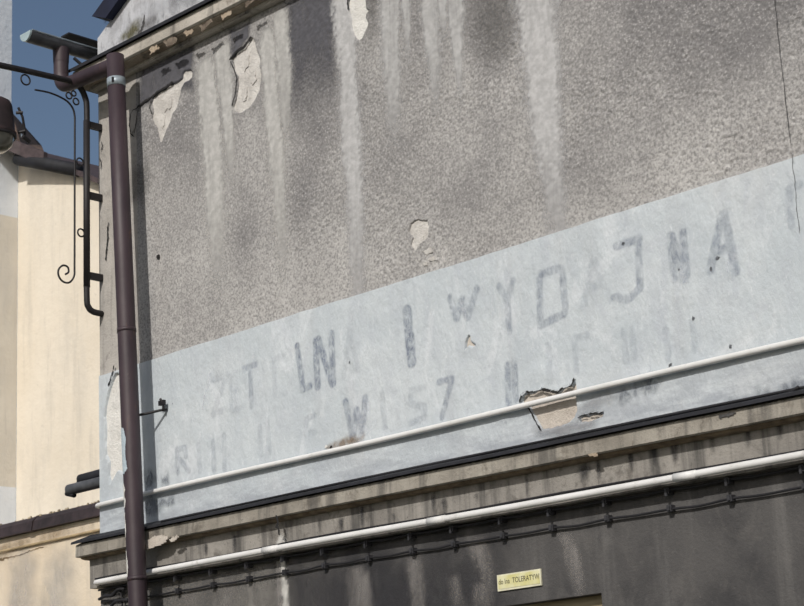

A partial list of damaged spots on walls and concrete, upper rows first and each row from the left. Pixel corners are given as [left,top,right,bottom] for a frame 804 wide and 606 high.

flaking render [137,71,192,142]
leakage [195,42,235,262]
flaking render [229,36,261,113]
leakage [259,9,291,246]
leakage [331,0,364,280]
flaking render [347,0,368,40]
leakage [421,0,465,89]
leakage [514,0,565,221]
crack [774,0,800,232]
peeling [519,378,603,431]
spalling [145,535,179,550]
leakage [219,561,489,606]